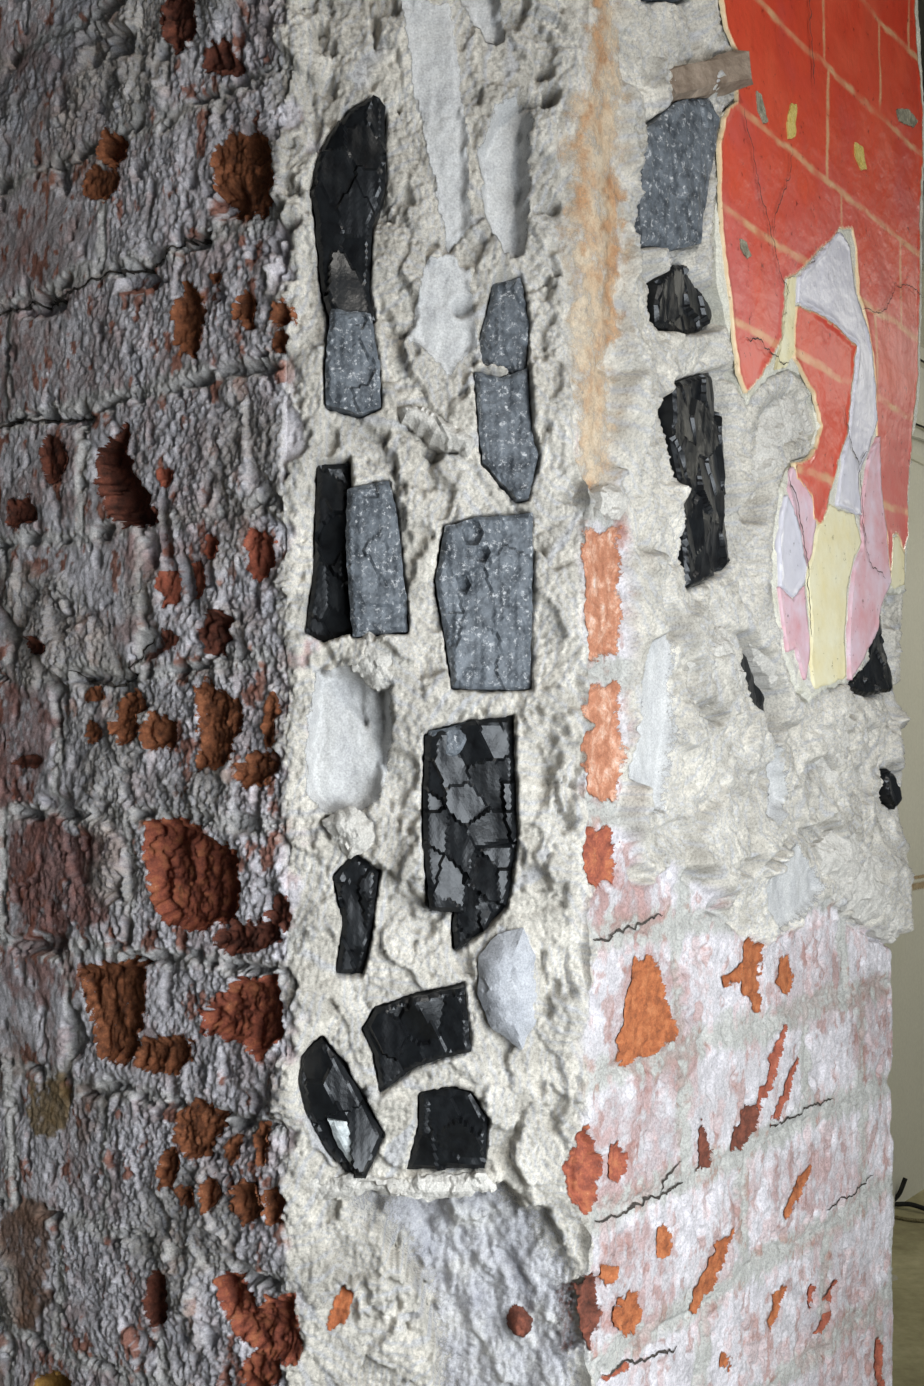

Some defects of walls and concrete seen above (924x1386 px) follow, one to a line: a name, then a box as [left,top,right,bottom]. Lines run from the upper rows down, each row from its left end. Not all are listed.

crack [0,231,212,316]
rust [560,0,630,489]
spalling [93,422,173,529]
spalling [141,816,292,957]
crack [593,913,663,942]
spalling [614,954,679,1067]
spalling [721,937,794,1013]
spalling [696,1024,799,1171]
crack [771,1098,833,1127]
spalling [562,1124,628,1215]
crack [595,1161,683,1223]